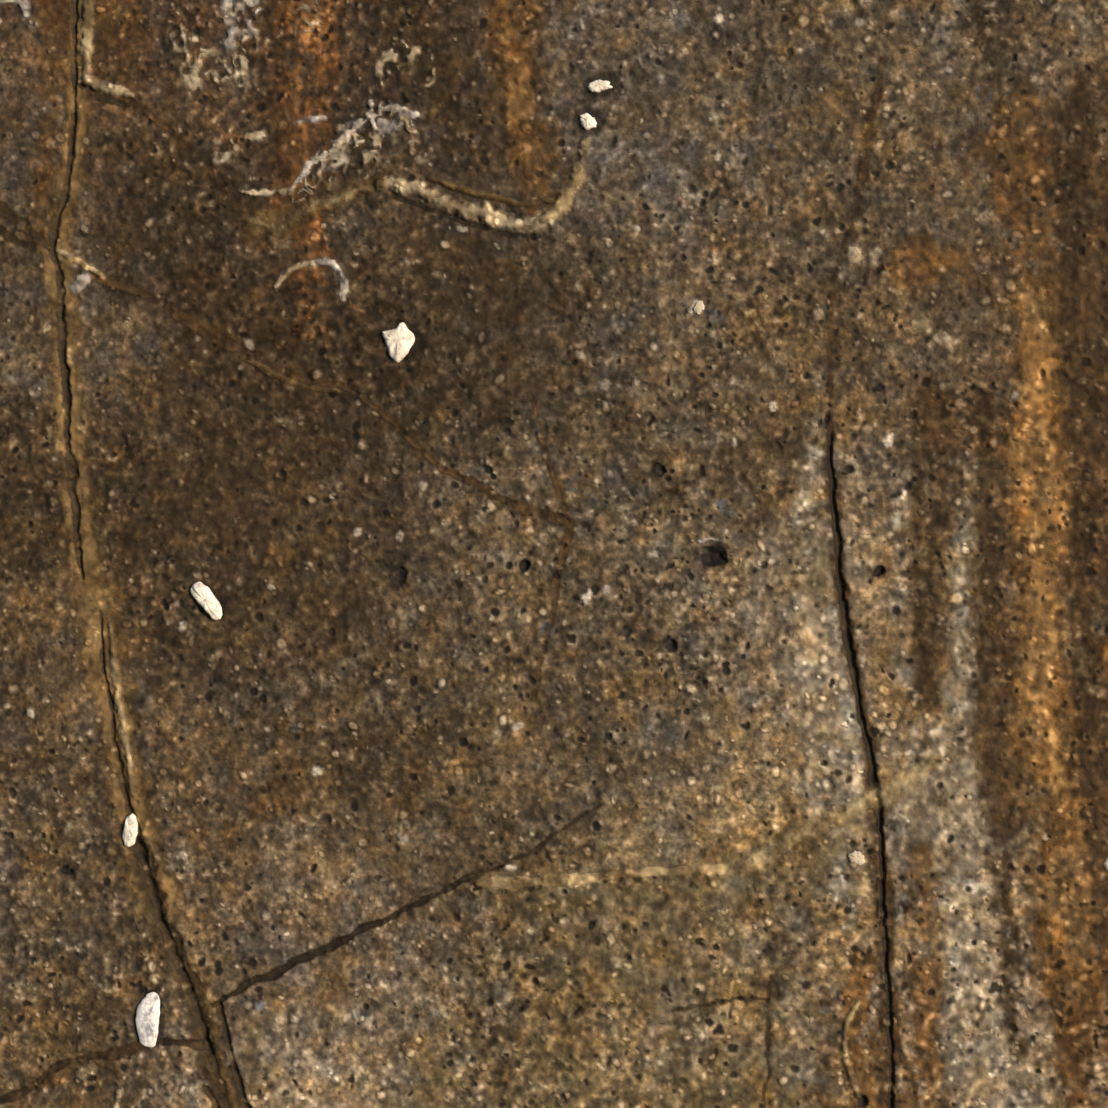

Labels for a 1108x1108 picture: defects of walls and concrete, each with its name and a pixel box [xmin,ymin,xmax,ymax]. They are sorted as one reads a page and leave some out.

crack [0,0,601,1108]
corrosion [487,0,556,212]
crack [824,56,903,1108]
corrosion [884,232,981,288]
corrosion [968,69,1108,1107]